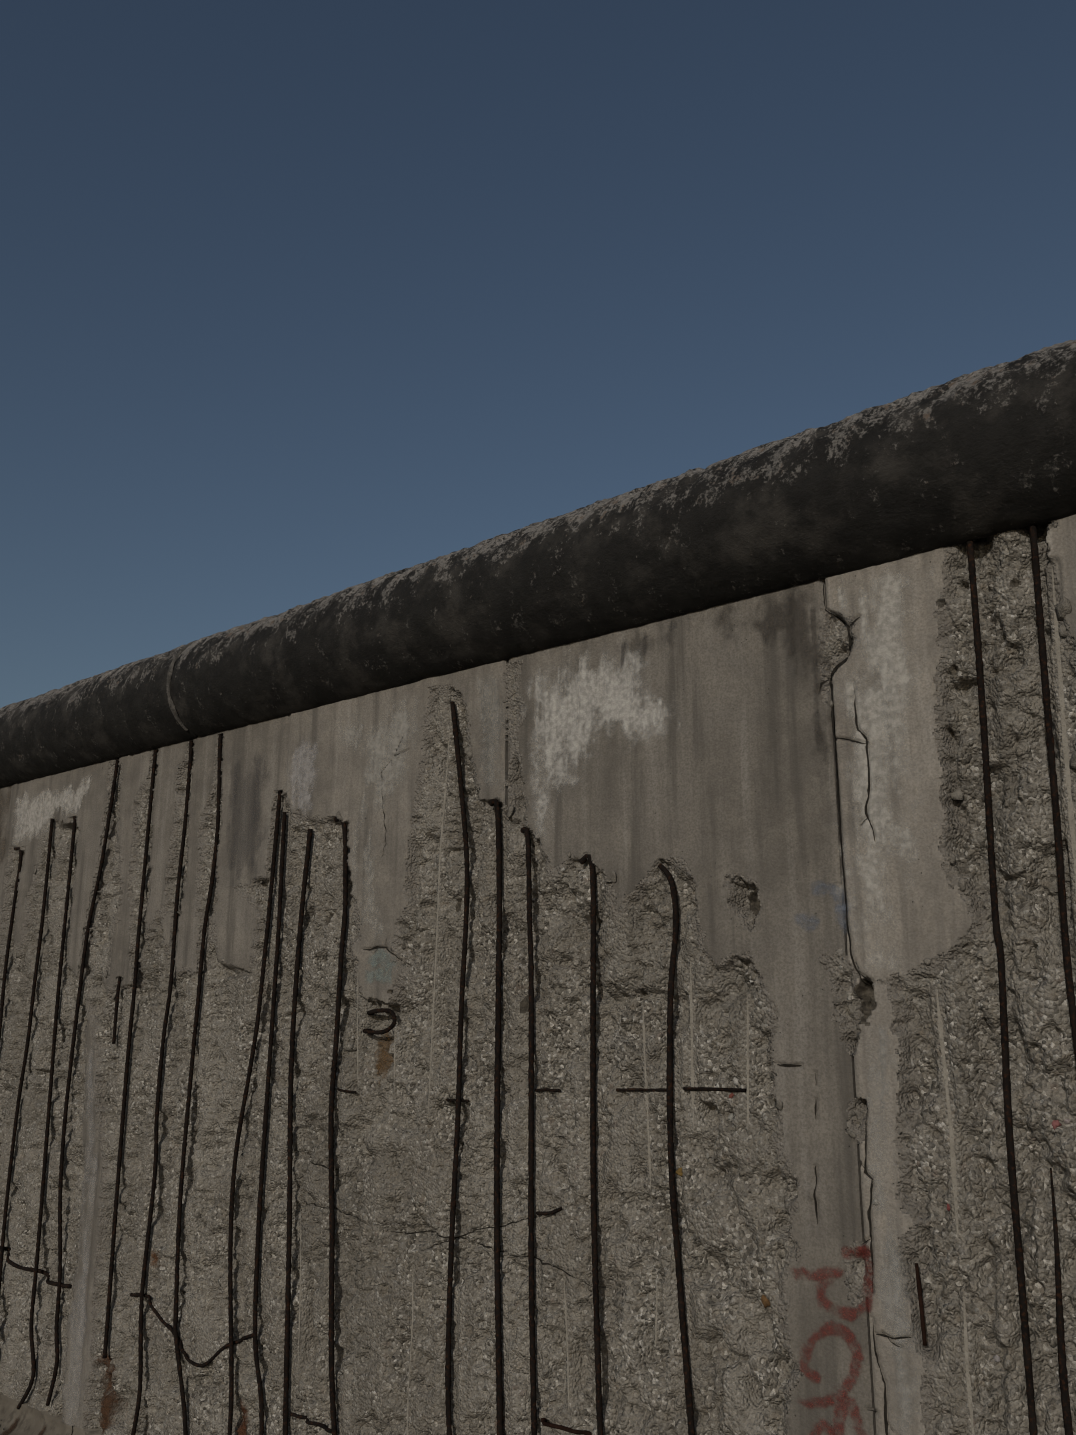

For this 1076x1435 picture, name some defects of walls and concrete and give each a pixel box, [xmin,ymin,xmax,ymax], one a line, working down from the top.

spalling [816,608,858,707]
crack [819,583,875,991]
spalling [819,949,864,1056]
spalling [872,519,1076,1435]
spalling [0,684,804,1435]
spalling [845,1097,868,1144]
spalling [840,1241,875,1307]